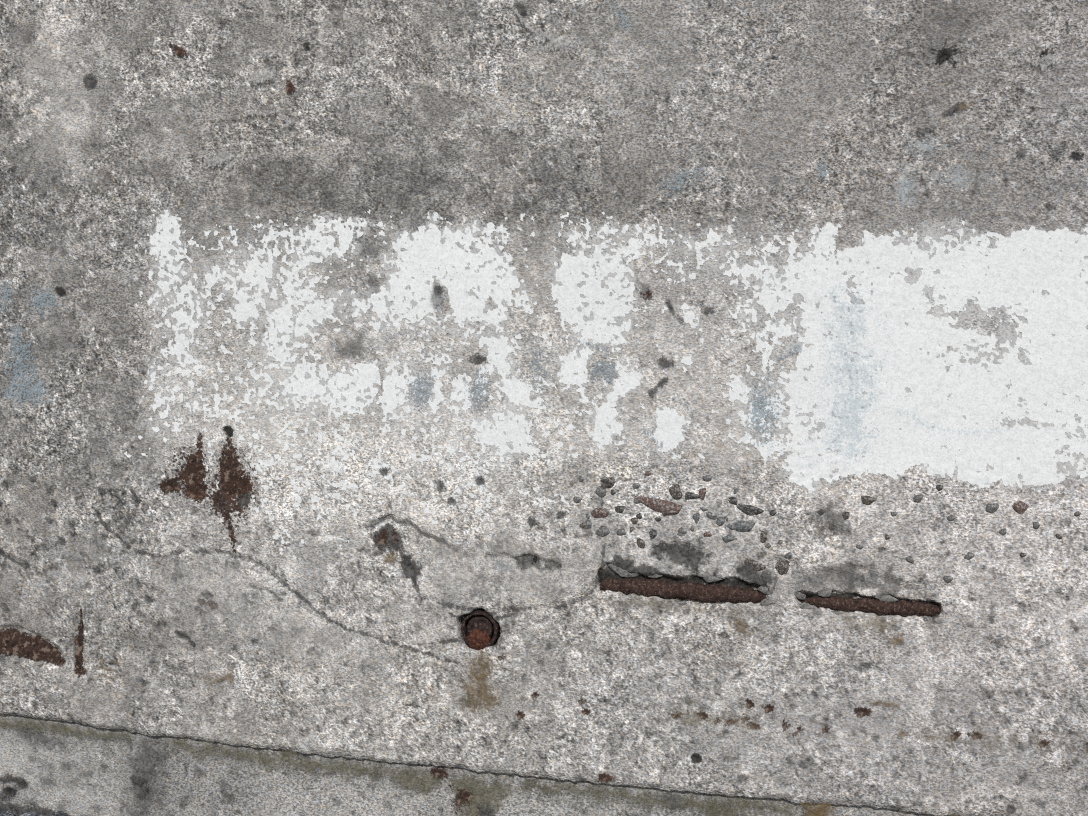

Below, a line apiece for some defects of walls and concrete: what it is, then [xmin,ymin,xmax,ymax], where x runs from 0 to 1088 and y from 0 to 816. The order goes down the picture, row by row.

peeling [124,209,1088,606]
corrosion [158,425,264,552]
corrosion [0,609,116,678]
crack [95,486,605,664]
spalling [794,588,942,618]